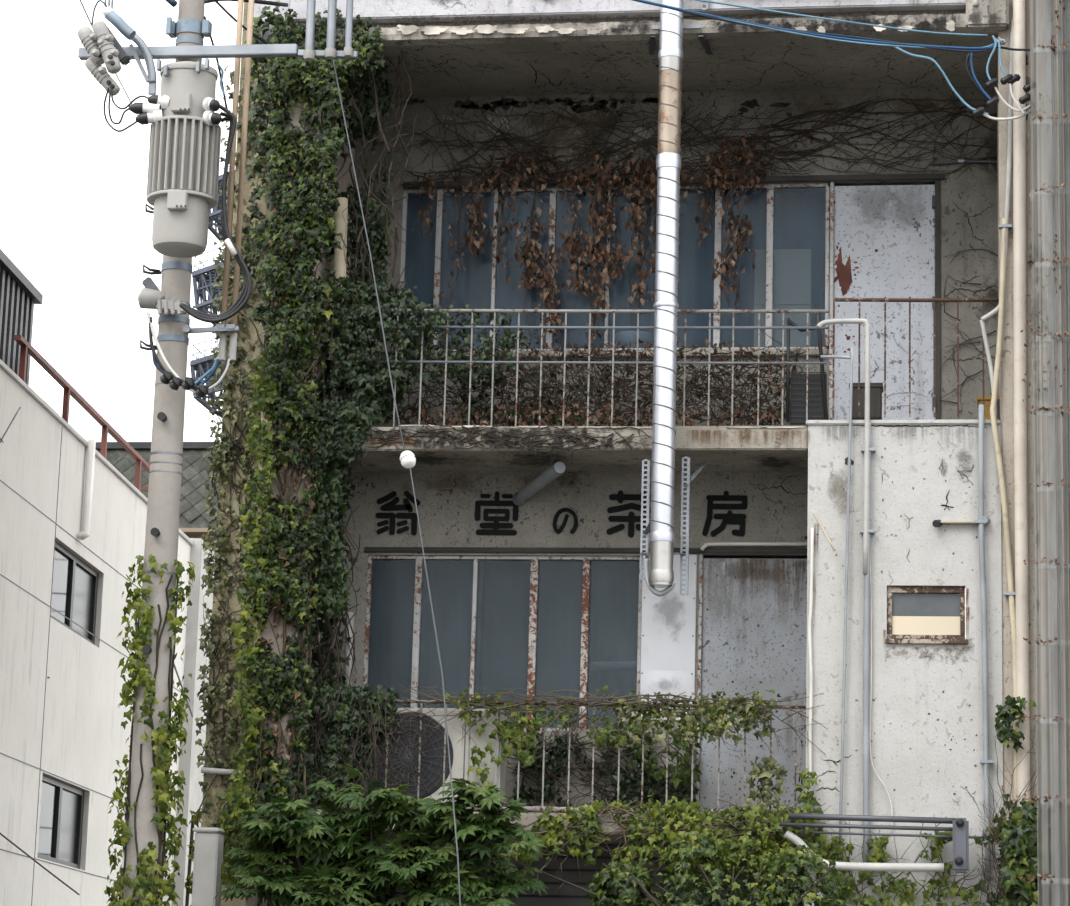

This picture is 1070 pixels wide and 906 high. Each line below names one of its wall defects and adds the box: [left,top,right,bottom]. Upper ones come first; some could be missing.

spalling [454,95,659,113]
crack [953,203,992,247]
crack [945,276,998,304]
crack [749,475,808,504]